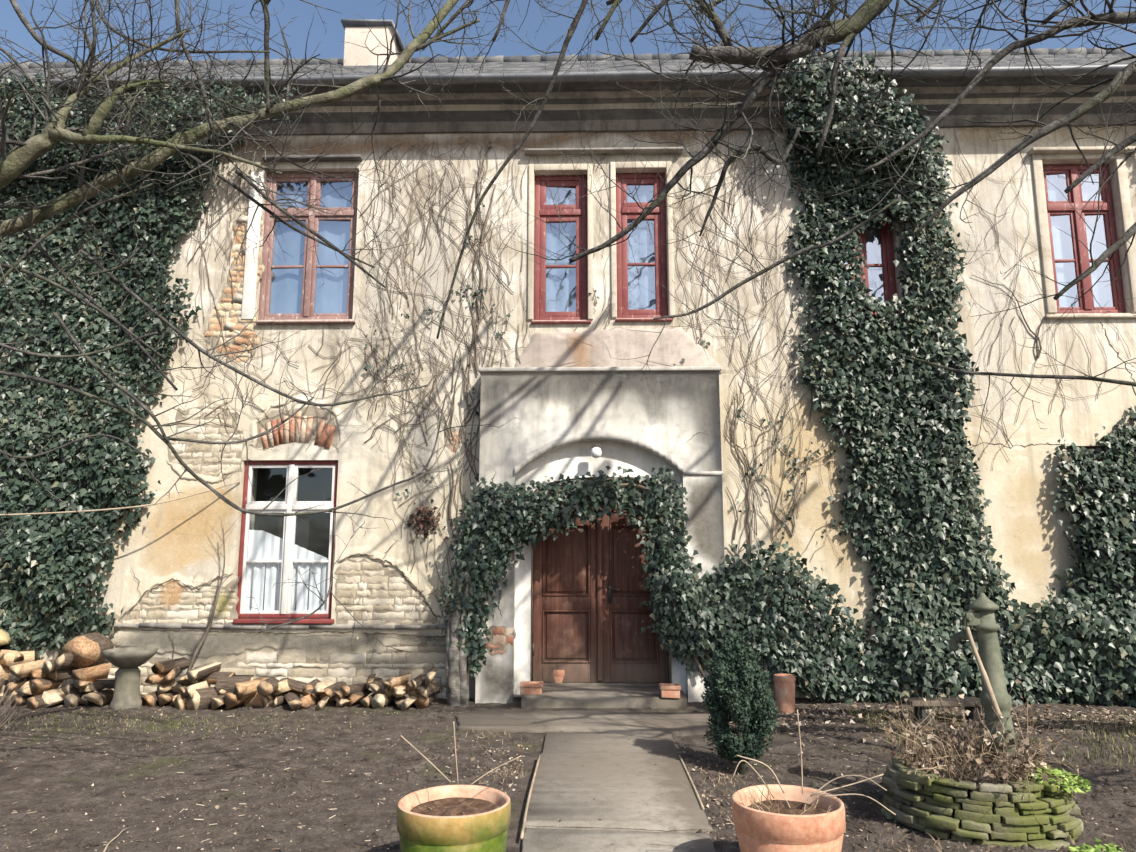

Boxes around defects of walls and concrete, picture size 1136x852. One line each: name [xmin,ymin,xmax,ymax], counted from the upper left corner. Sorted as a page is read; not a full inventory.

flaking render [202,206,266,362]
flaking render [166,395,346,484]
flaking render [96,566,240,630]
flaking render [138,545,447,699]
flaking render [94,659,119,692]